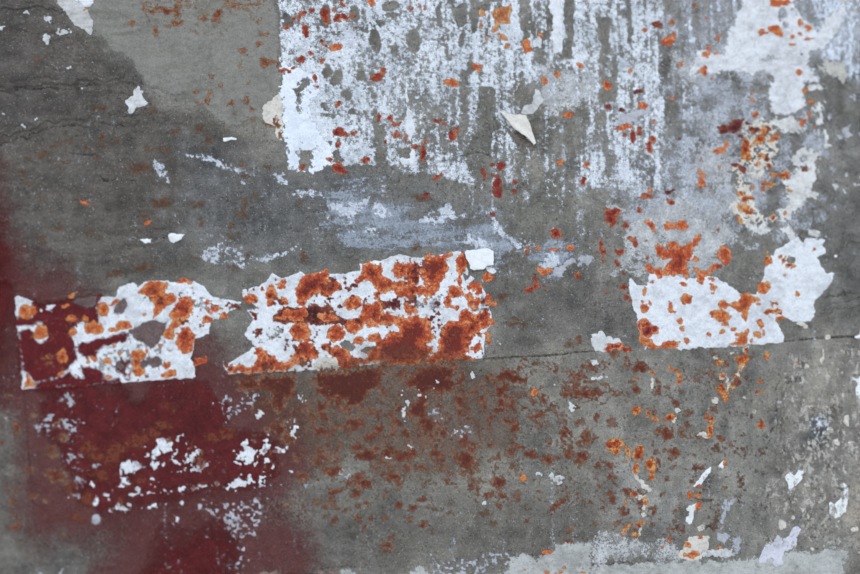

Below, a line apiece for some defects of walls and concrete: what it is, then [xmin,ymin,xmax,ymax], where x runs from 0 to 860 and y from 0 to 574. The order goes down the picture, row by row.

corrosion [642,20,676,46]
peeling [803,0,860,84]
peeling [84,0,721,215]
corrosion [480,162,517,198]
corrosion [615,124,656,153]
corrosion [713,91,792,225]
peeling [465,222,531,283]
peeling [129,320,167,369]
corrosion [23,188,786,559]
crack [484,351,596,359]
peeling [409,330,860,574]
peeling [63,418,299,574]